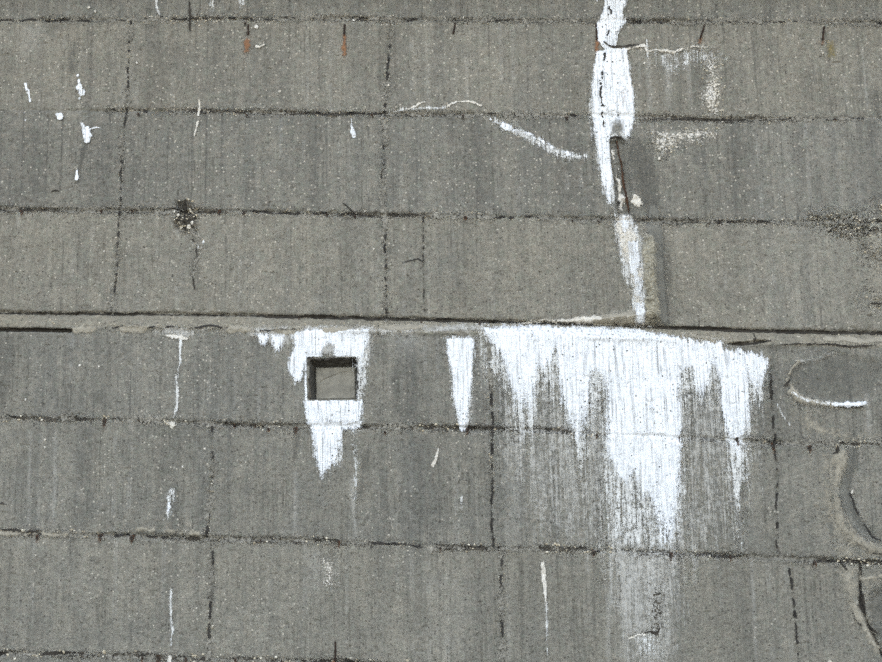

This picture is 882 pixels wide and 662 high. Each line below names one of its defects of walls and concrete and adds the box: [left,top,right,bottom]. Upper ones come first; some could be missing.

efflorescence [393,100,482,113]
spalling [372,108,579,123]
spalling [633,54,866,160]
spalling [63,198,292,235]
spalling [529,135,643,224]
spalling [773,204,882,261]
leakage [257,328,409,487]
efflorescence [445,214,769,660]
crack [841,562,882,655]